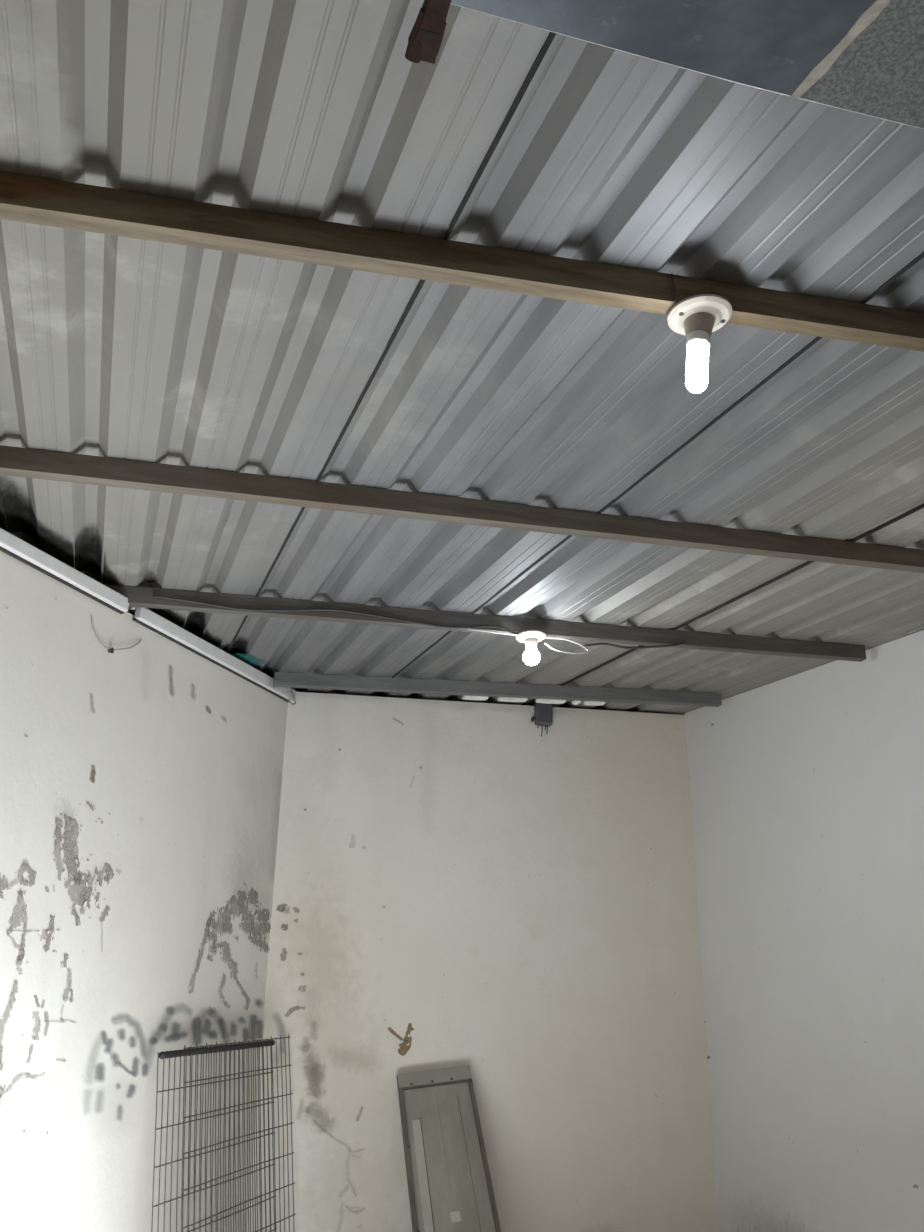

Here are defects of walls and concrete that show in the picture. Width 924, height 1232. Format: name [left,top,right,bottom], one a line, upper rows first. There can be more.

water stain [0,483,120,585]
water stain [140,576,156,588]
water stain [149,608,266,672]
peeling [0,863,37,899]
peeling [53,813,114,926]
peeling [41,916,73,1002]
peeling [189,887,271,1011]